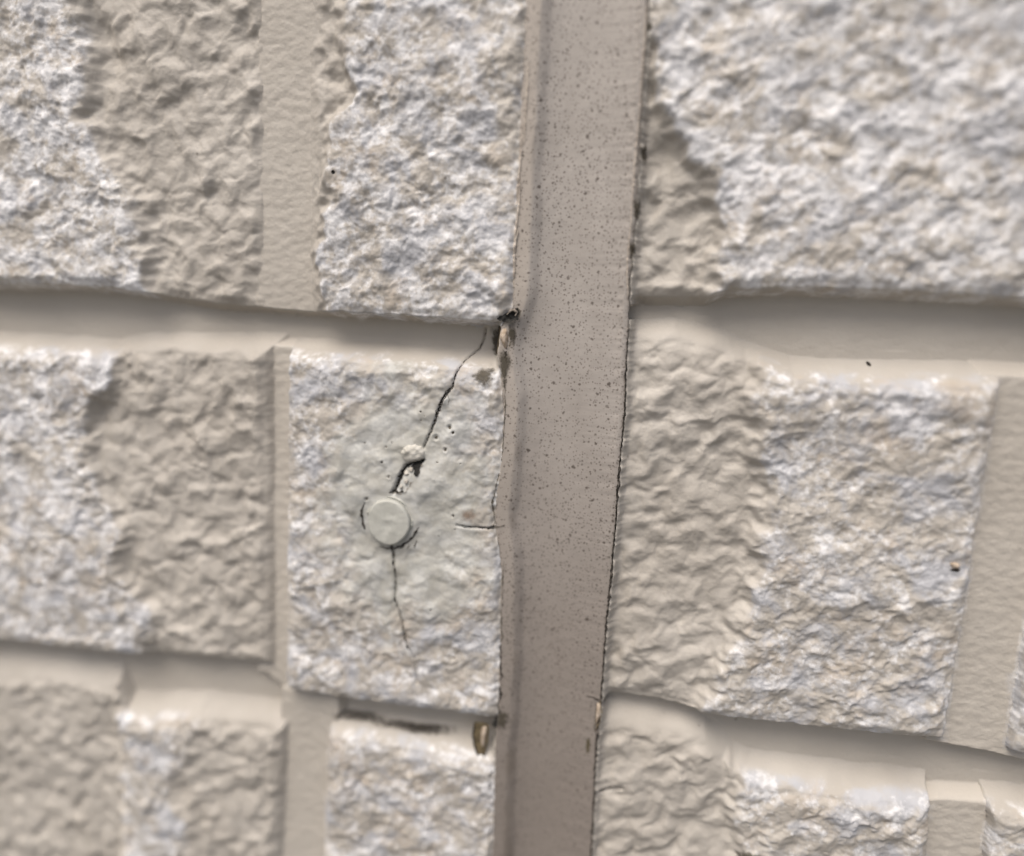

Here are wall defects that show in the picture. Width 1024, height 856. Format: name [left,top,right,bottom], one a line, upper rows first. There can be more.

crack [424,328,487,447]
crack [459,364,506,529]
crack [600,338,629,700]
crack [590,733,613,856]